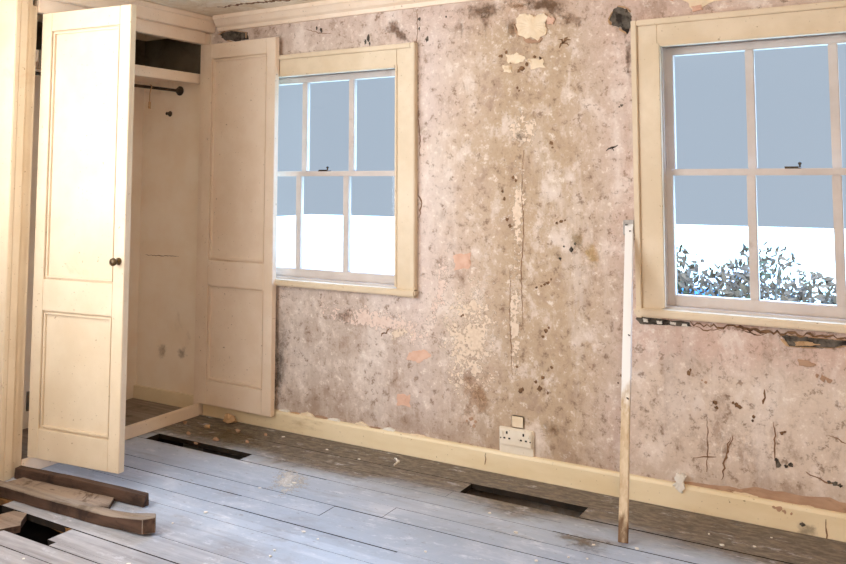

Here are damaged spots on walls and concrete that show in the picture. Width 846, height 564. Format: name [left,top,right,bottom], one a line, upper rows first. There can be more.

damp [528,0,557,12]
peeling [683,0,719,12]
peeling [514,13,555,44]
peeling [498,50,546,73]
damp [318,247,522,402]
spalling [780,335,846,349]
spalling [797,359,832,383]